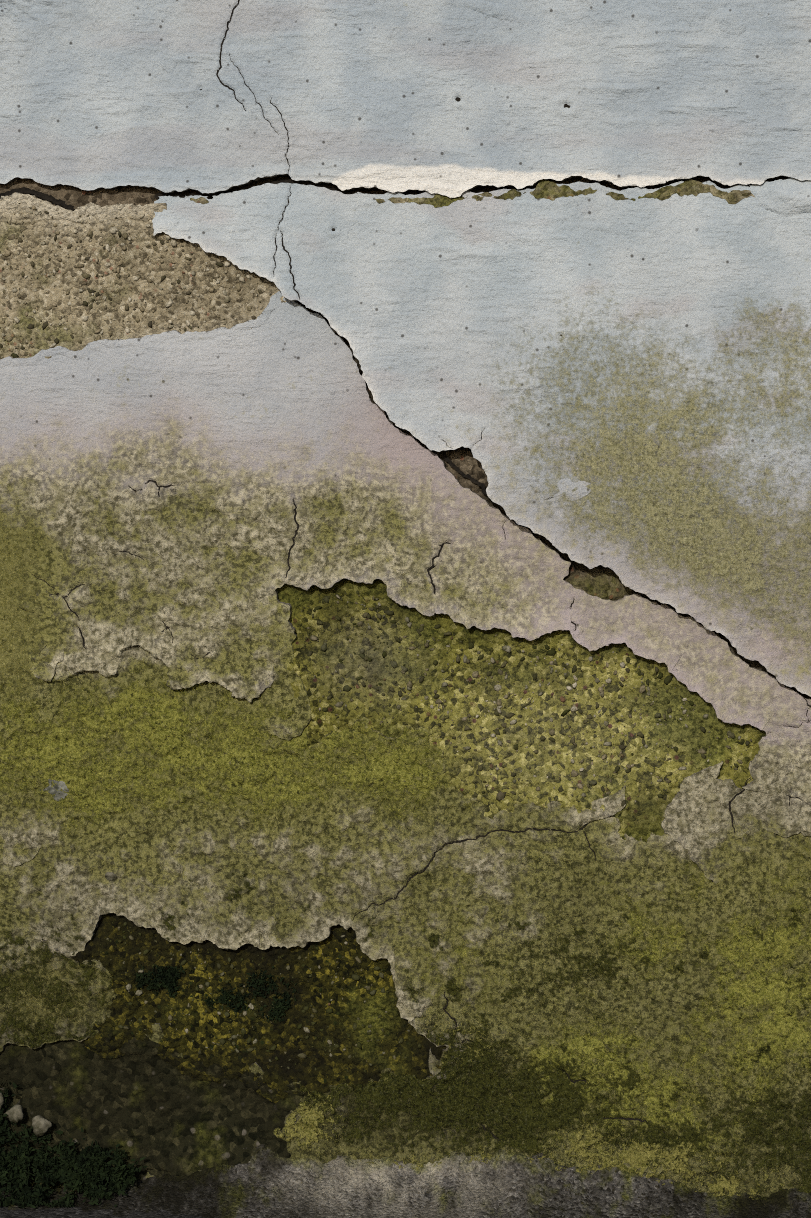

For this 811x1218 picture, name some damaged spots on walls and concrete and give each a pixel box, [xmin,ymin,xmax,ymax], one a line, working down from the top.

spalling [0,193,289,368]
crack [0,0,811,728]
spalling [28,560,792,883]
crack [352,808,624,921]
spalling [0,894,454,1180]